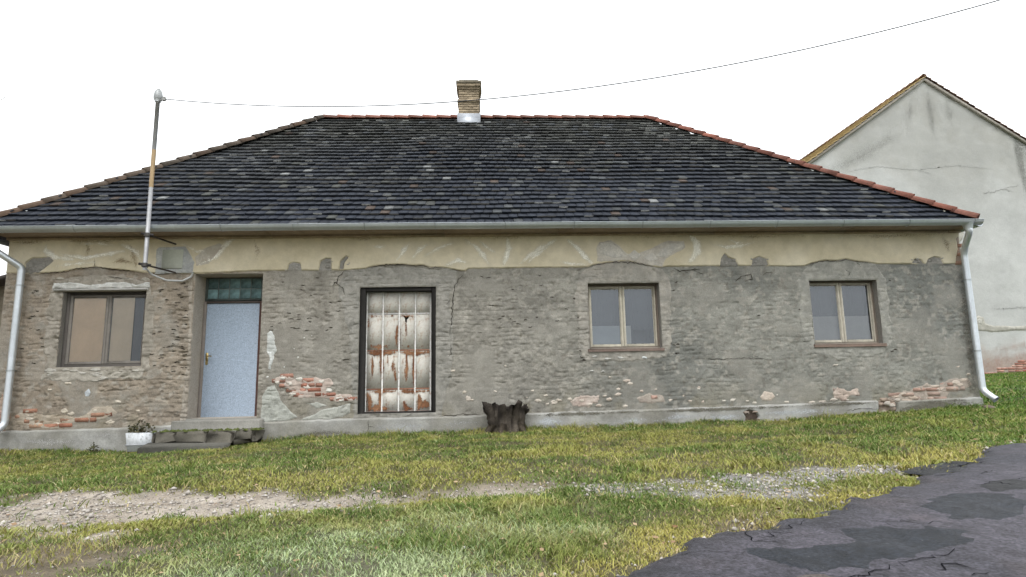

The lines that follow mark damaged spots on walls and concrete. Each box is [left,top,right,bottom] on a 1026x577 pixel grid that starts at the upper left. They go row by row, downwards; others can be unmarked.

spalling [25,257,53,274]
spalling [596,240,685,267]
peeling [52,277,150,290]
spalling [977,316,1026,332]
flaking render [266,331,357,402]
corrosion [366,310,430,412]
flaking render [984,360,1026,374]
flaking render [0,368,144,431]
flaking render [878,366,972,412]